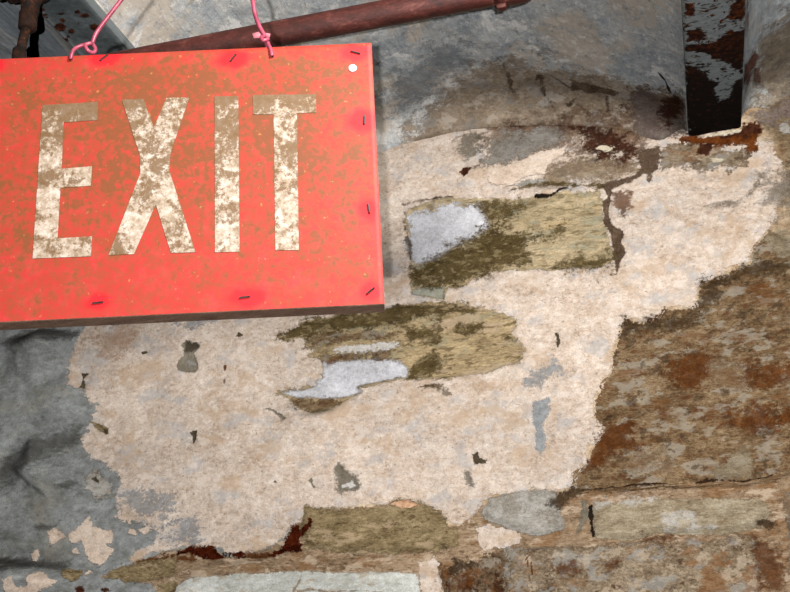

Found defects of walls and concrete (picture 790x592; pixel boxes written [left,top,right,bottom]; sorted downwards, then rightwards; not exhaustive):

rust [675,121,763,156]
crack [512,168,645,274]
peeling [1,128,790,592]